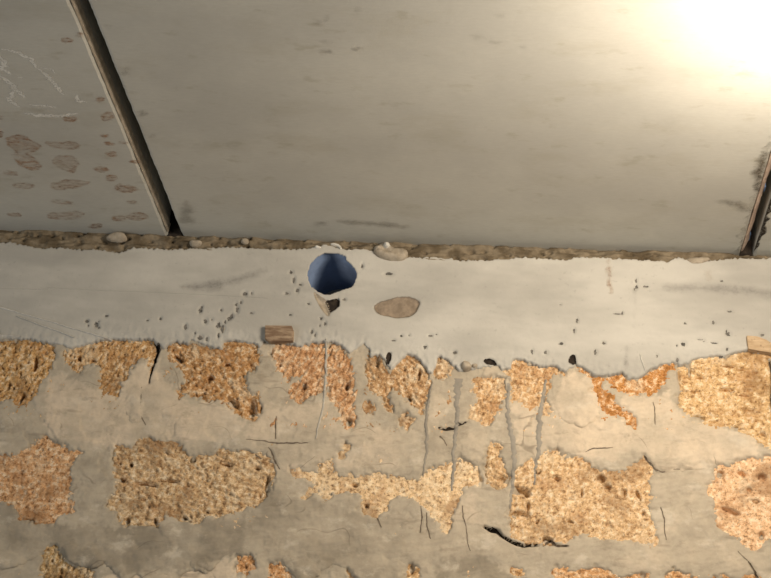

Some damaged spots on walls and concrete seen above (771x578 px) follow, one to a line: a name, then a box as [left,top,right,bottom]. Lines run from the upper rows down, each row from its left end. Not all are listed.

water stain [754,199,771,251]
spalling [184,292,252,341]
spalling [307,292,346,337]
crack [438,421,468,446]
crack [462,506,569,551]